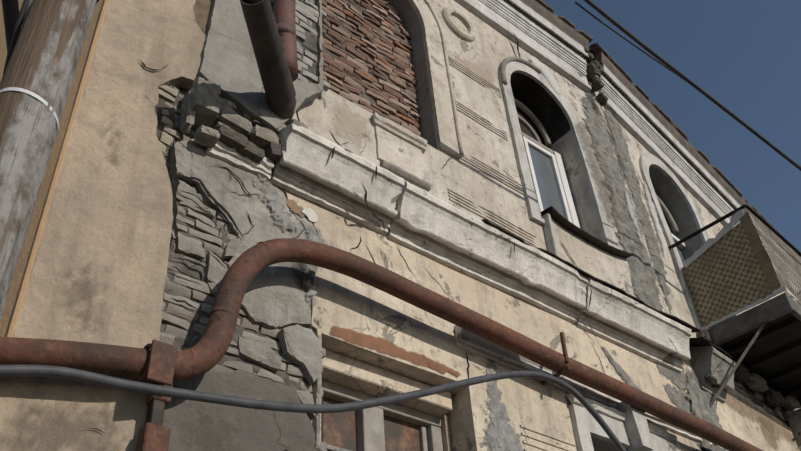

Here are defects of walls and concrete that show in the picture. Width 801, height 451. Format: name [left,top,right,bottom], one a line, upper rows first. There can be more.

flaking render [193,0,213,35]
flaking render [295,0,330,92]
crack [169,140,255,283]
flaking render [146,85,318,351]
crack [361,166,445,291]
flaking render [162,262,326,451]
crack [587,286,605,372]
flaking render [730,358,801,429]